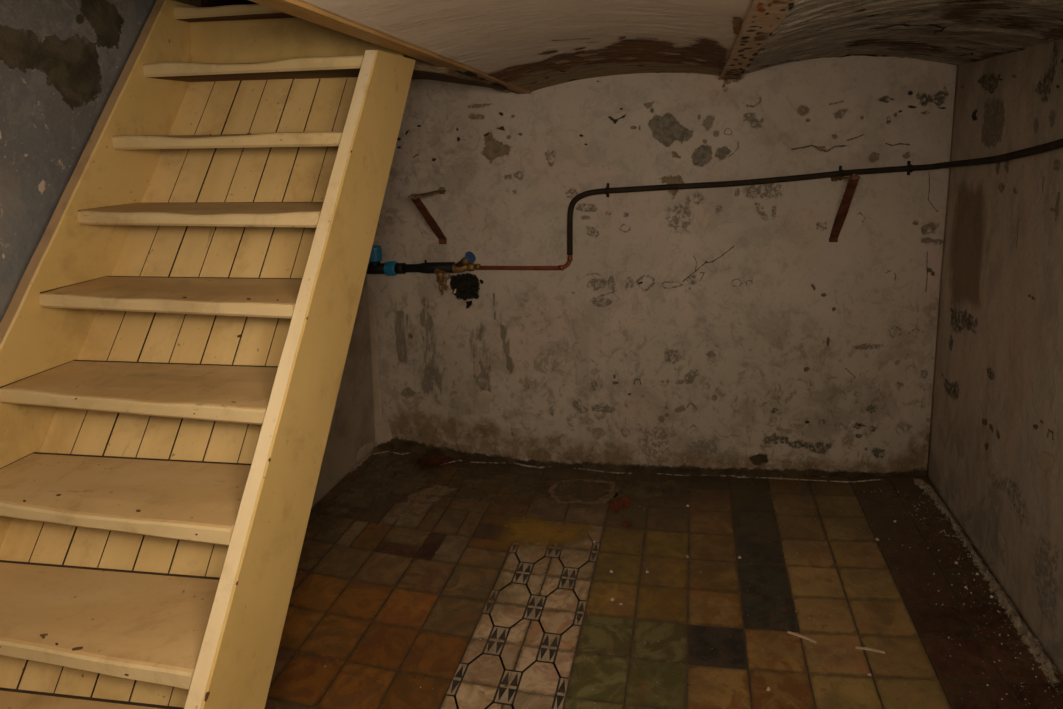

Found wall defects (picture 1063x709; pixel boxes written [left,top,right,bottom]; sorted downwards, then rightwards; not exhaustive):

peeling [456,36,729,94]
spalling [481,112,523,164]
spalling [609,101,739,167]
spalling [447,272,484,309]
water stain [372,400,929,483]